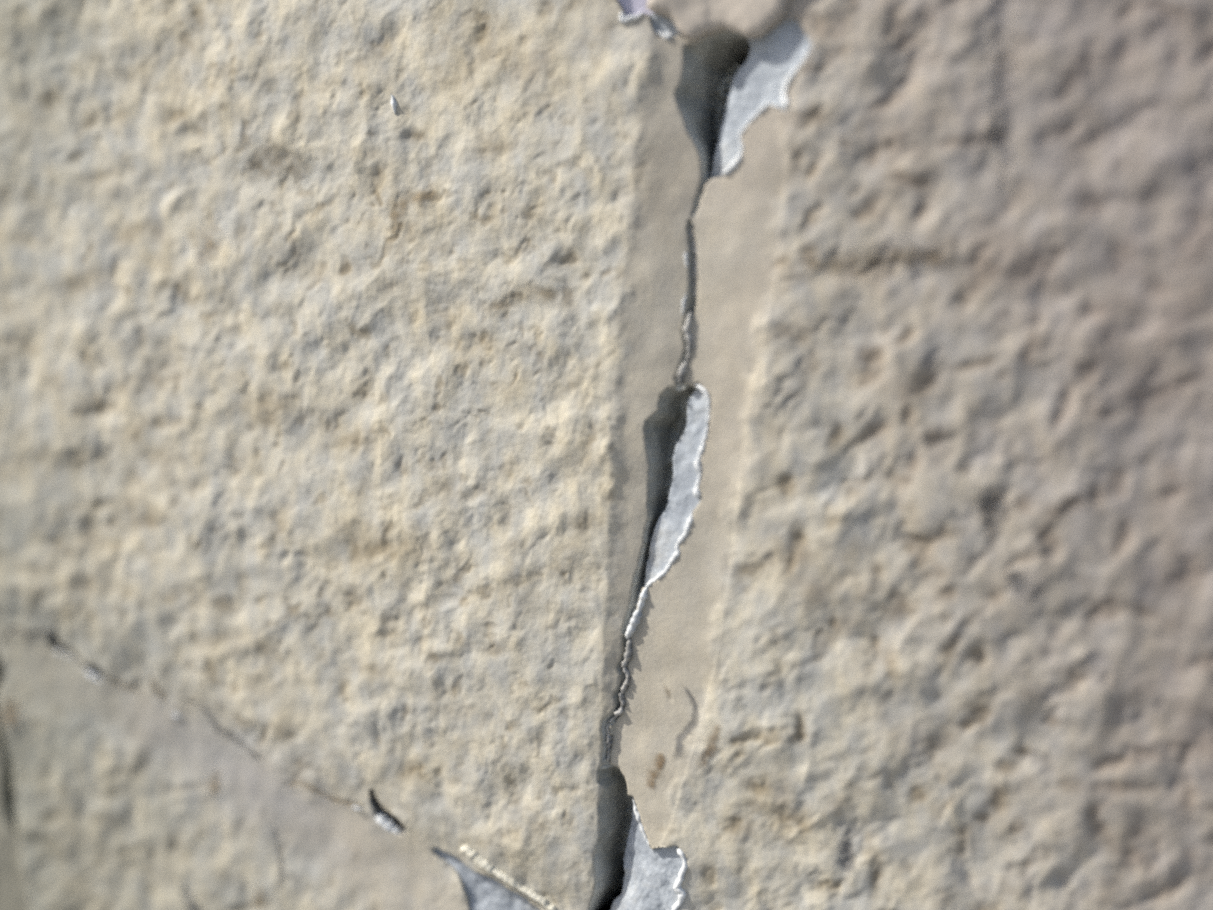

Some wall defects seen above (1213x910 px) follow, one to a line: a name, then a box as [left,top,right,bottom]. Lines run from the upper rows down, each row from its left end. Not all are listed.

spalling [618,0,812,220]
crack [675,219,698,391]
spalling [621,381,712,639]
crack [0,722,17,832]
crack [0,628,49,683]
crack [201,707,256,756]
spalling [353,789,408,835]
spalling [433,845,557,910]
crack [600,632,633,769]
spalling [589,759,688,910]
crack [677,690,697,753]